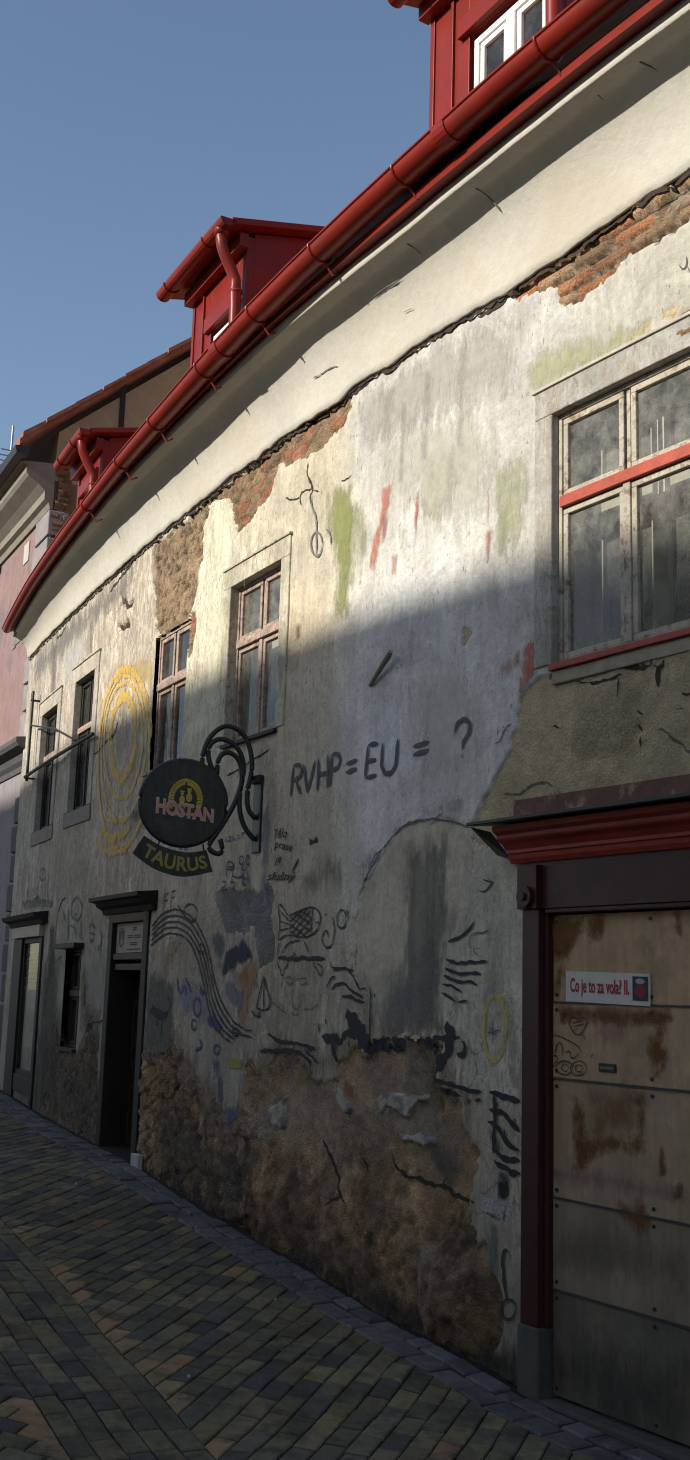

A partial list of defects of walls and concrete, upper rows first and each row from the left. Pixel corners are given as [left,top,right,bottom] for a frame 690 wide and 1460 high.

spalling [509,174,690,307]
flaking render [154,391,353,658]
flaking render [136,636,690,1372]
crack [323,1140,474,1206]